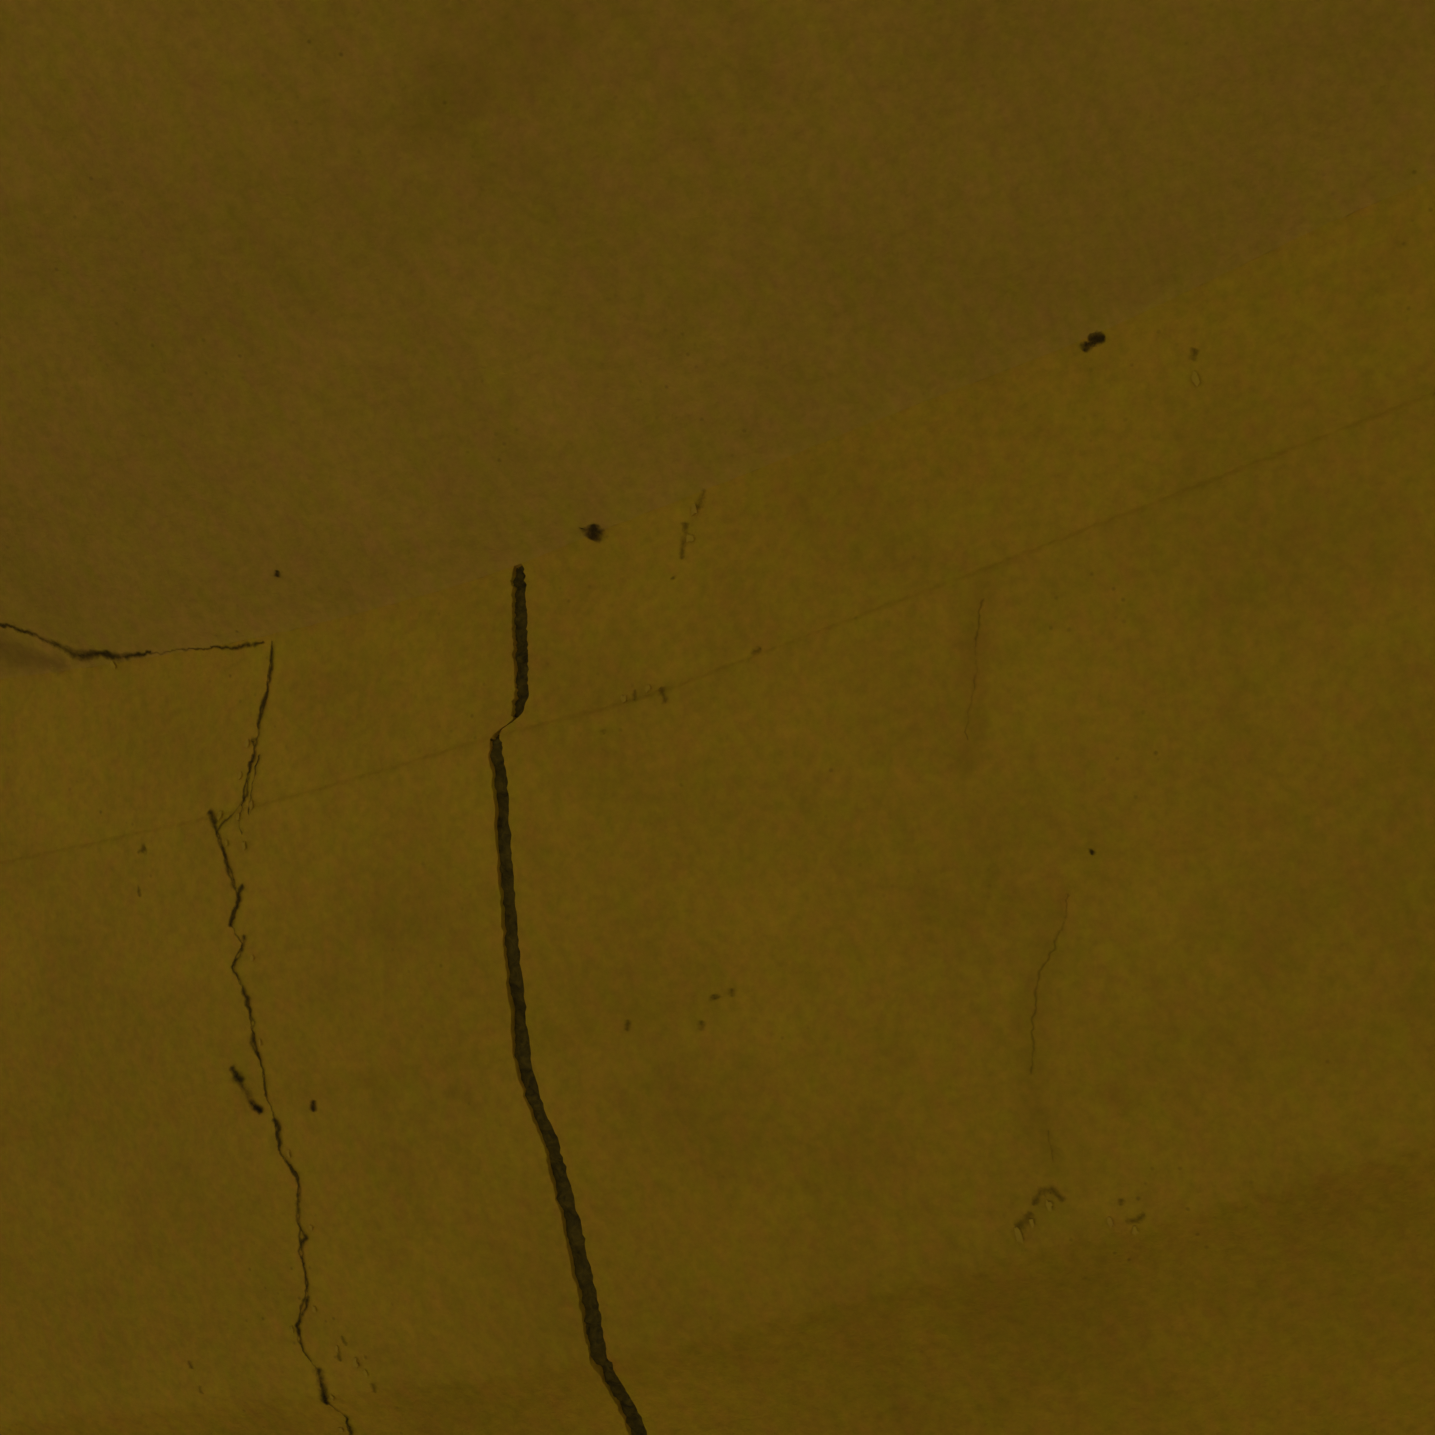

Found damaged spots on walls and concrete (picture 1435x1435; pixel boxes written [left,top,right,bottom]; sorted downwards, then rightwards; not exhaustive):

crack [0,624,352,1435]